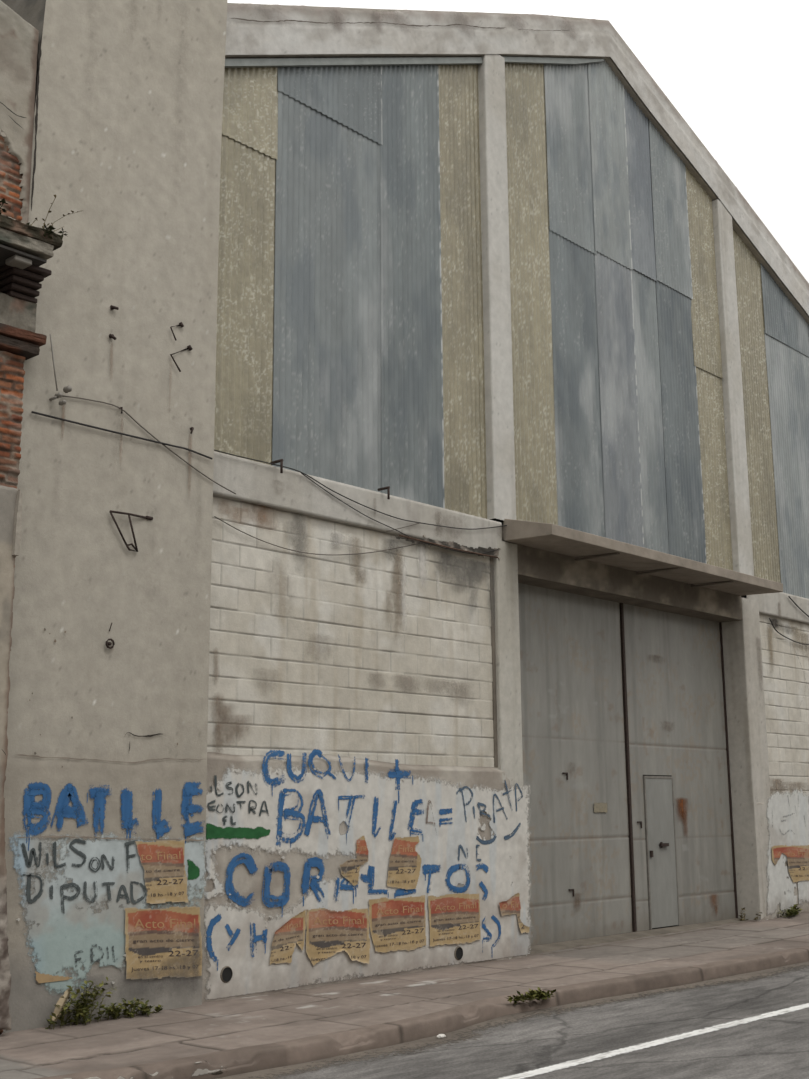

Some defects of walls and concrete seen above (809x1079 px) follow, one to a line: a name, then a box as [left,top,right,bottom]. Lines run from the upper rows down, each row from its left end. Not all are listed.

spalling [0,129,24,222]
damp [389,548,406,613]
rust [678,799,686,818]